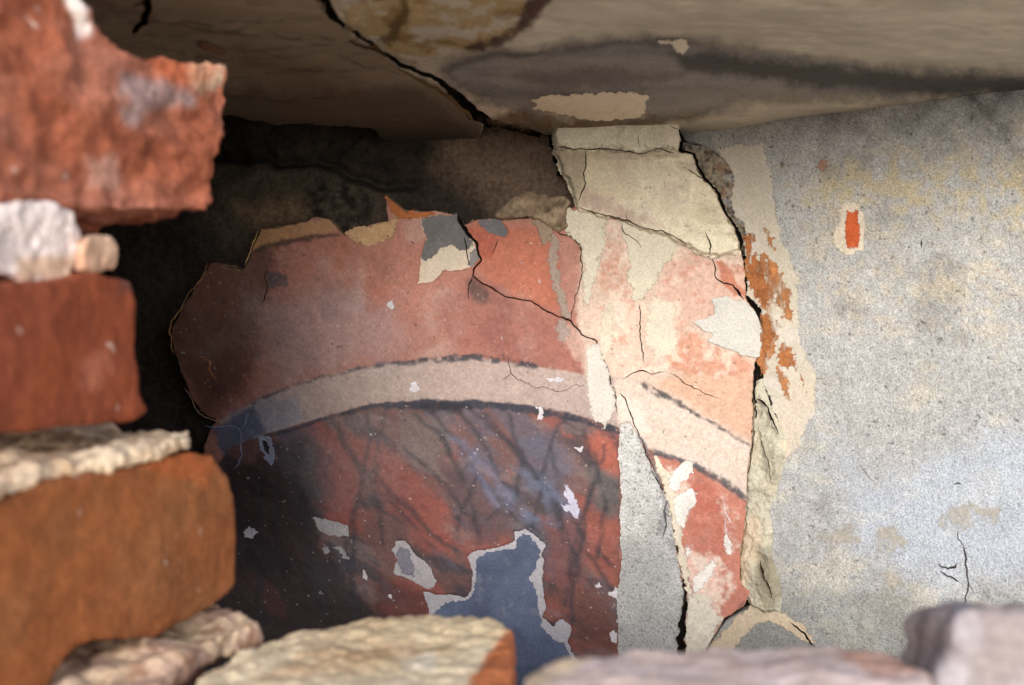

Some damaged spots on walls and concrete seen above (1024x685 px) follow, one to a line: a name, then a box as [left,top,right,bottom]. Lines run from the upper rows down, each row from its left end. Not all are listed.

flaking render [345,196,480,284]
flaking render [478,219,508,237]
crack [318,0,744,300]
flaking render [529,91,817,462]
damp [337,0,1024,130]
corrosion [742,227,807,398]
crack [457,216,717,653]
flaking render [391,529,575,685]
flaking render [595,423,716,656]
crack [938,533,974,601]